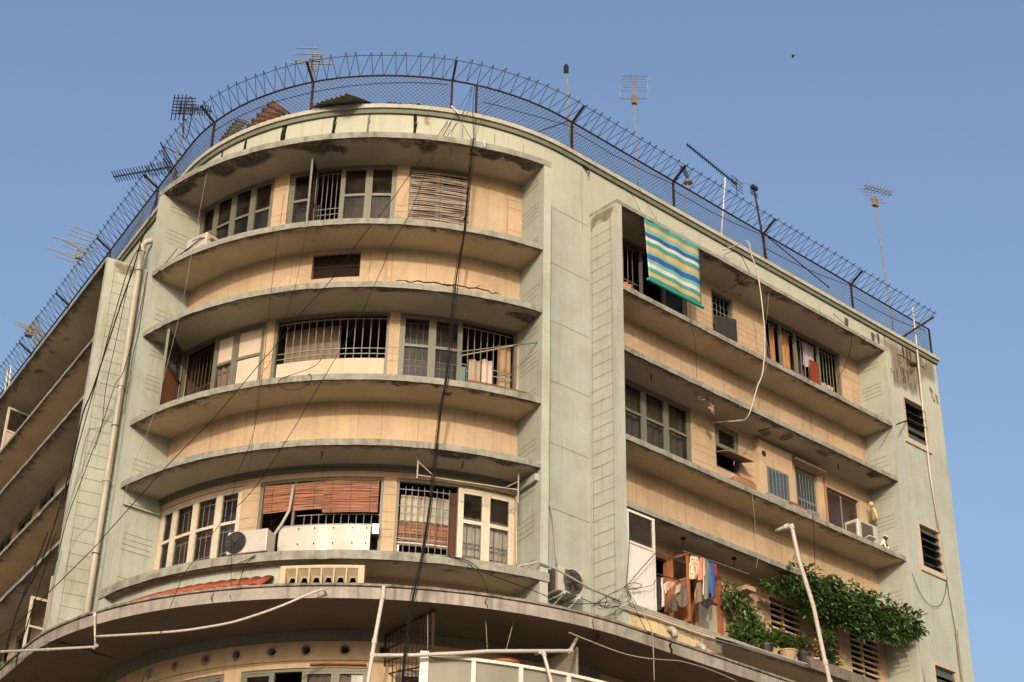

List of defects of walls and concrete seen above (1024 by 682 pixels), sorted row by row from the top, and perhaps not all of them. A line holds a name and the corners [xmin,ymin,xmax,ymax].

spalling [299,142,346,154]
spalling [469,148,538,171]
spalling [167,154,269,197]
crack [396,280,499,294]
damp [871,332,933,393]